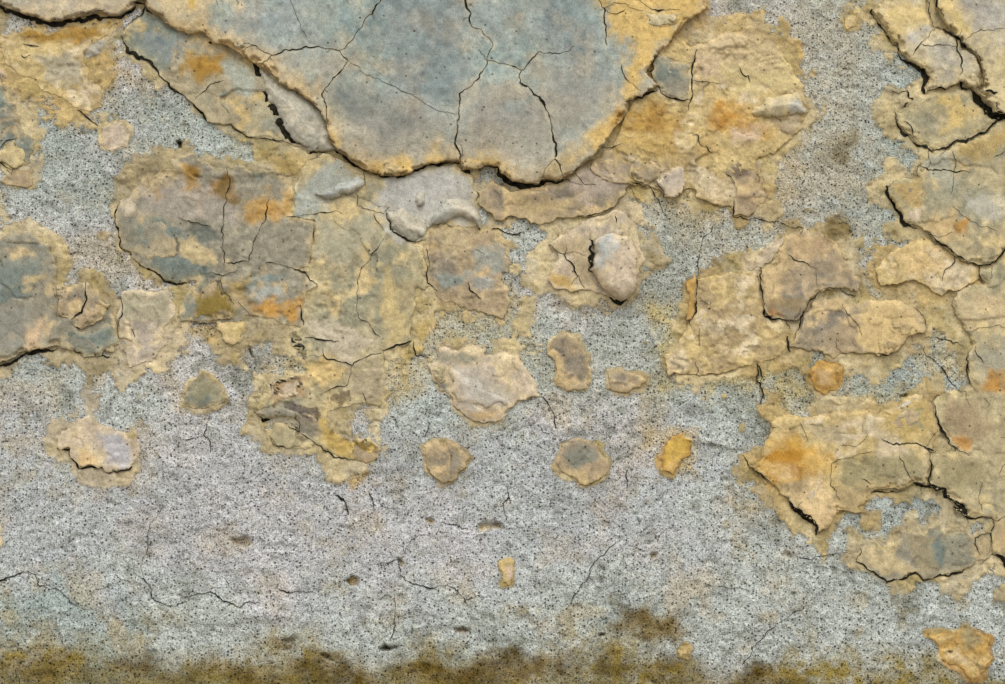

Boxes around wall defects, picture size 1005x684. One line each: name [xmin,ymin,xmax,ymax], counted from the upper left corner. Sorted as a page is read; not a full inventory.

crack [245,0,622,185]
peeling [872,0,982,94]
crack [893,0,1005,284]
crack [178,167,437,405]
peeling [0,21,808,464]
crack [689,174,862,375]
peeling [663,227,927,395]
peeling [875,238,980,296]
peeling [57,416,140,473]
crack [788,497,862,560]
crack [830,307,1005,567]
peeling [855,525,991,582]